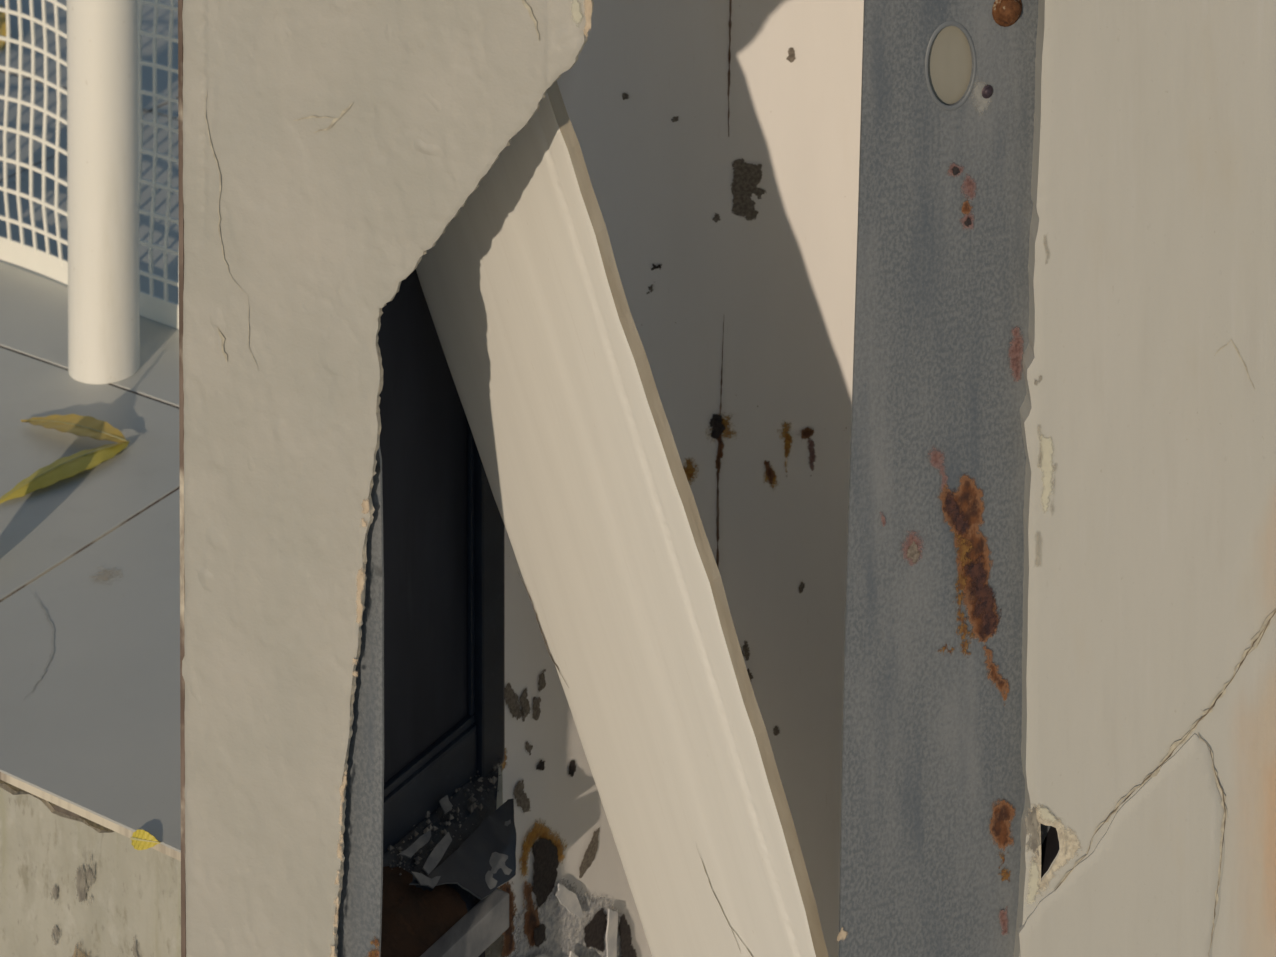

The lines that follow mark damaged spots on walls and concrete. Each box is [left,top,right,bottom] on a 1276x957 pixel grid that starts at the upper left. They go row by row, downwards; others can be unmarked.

peeling [712,158,765,222]
corrosion [948,163,976,229]
corrosion [683,459,697,485]
corrosion [709,414,735,473]
corrosion [764,422,816,488]
corrosion [928,447,1009,706]
crack [1054,610,1276,957]
peeling [509,827,637,957]
corrosion [989,800,1015,882]
flaking render [1025,805,1081,904]